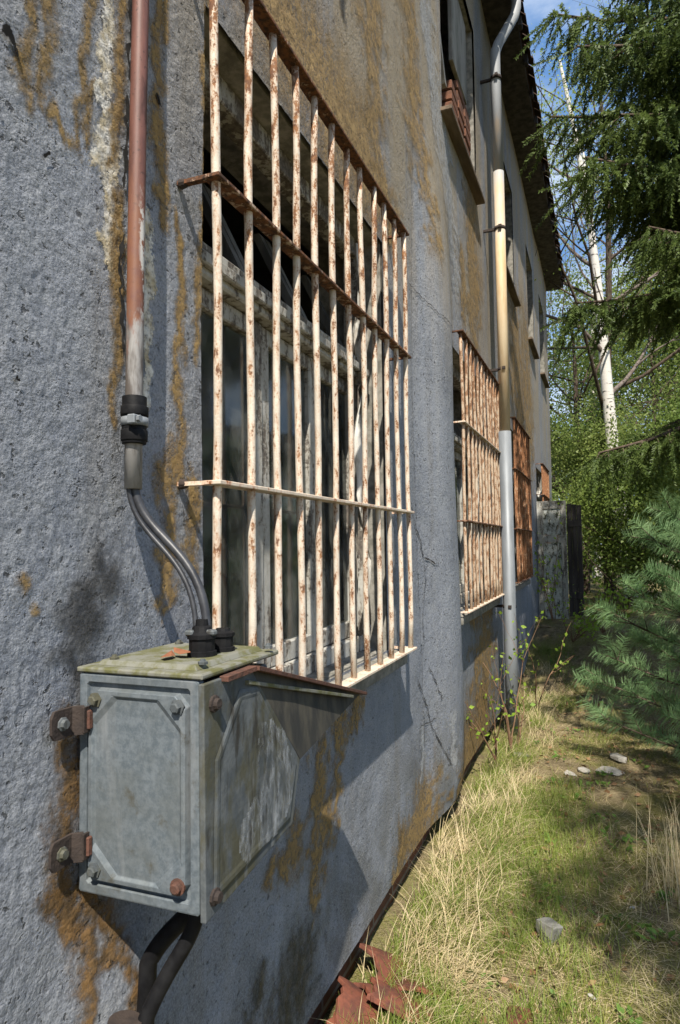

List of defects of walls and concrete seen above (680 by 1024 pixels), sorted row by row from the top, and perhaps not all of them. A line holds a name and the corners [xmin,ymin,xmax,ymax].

water stain [11,0,97,148]
water stain [106,0,127,168]
water stain [253,0,400,237]
water stain [420,0,461,293]
water stain [107,188,127,428]
water stain [149,0,203,615]
corrosion [50,735,80,841]
corrosion [306,694,365,927]
crack [418,668,454,771]
corrosion [37,866,139,1024]
water stain [244,930,321,1024]